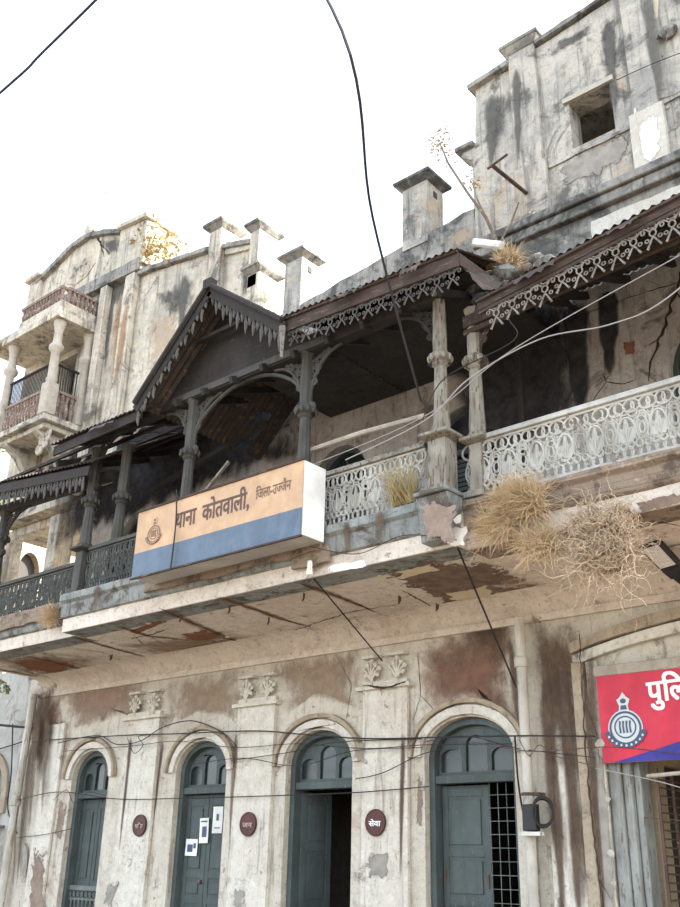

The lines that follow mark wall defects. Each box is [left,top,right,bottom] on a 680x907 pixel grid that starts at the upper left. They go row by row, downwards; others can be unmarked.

water stain [486,71,520,163]
water stain [563,303,588,406]
water stain [598,292,618,374]
crack [588,272,680,401]
peeling [420,501,462,543]
water stain [497,580,535,593]
water stain [428,619,518,719]
water stain [538,626,604,907]
peeling [21,841,47,907]
peeling [104,881,119,907]
peeling [234,889,245,907]
peeling [365,853,388,879]